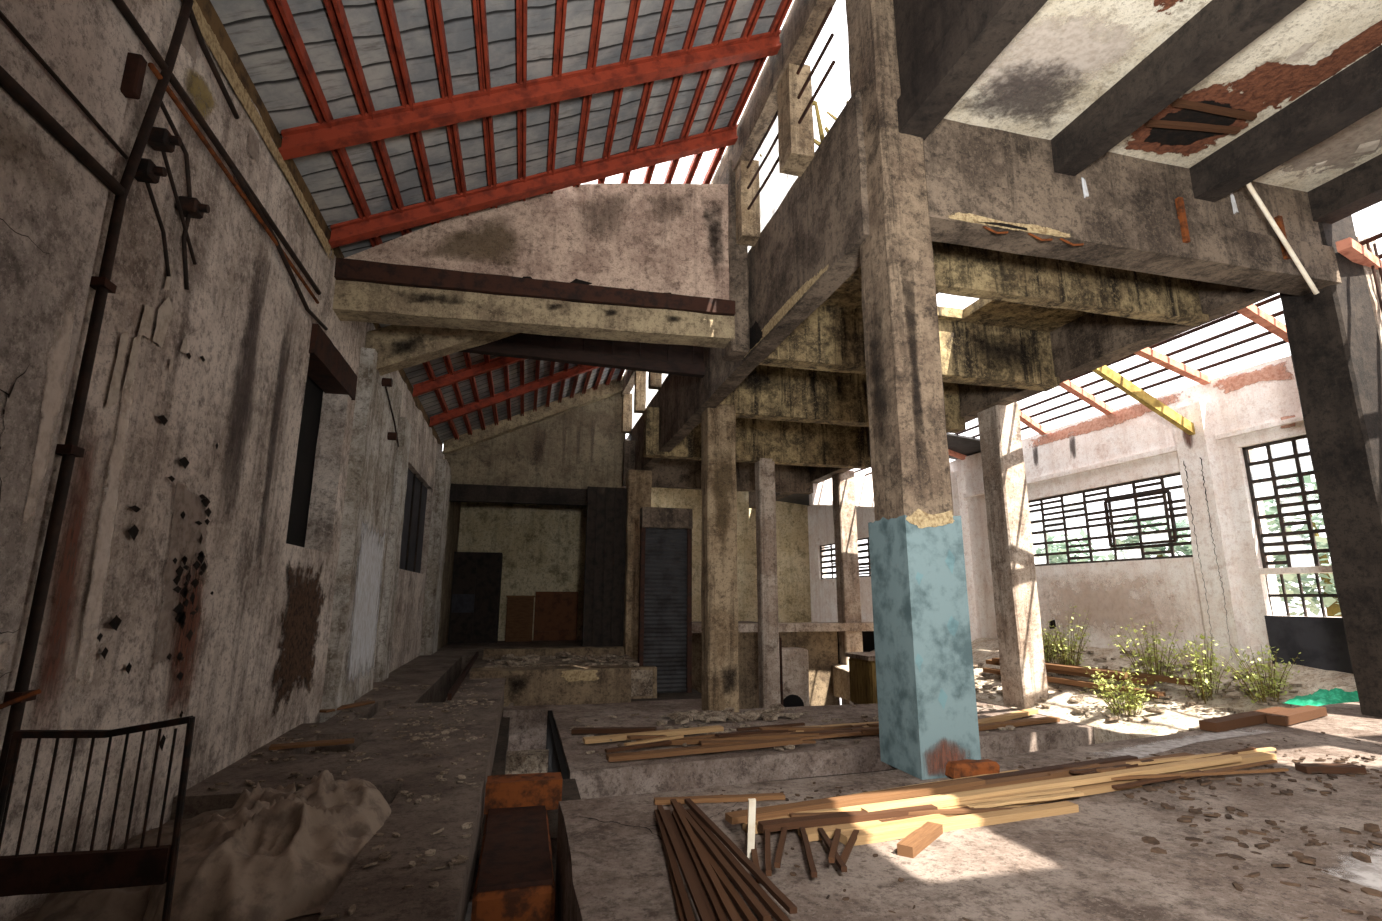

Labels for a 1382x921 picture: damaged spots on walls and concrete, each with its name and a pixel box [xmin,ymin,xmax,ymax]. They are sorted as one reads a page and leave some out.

damp [965,17,1136,126]
flaking render [1232,41,1339,109]
peeling [1280,107,1382,178]
rust [168,567,204,711]
spalling [272,560,327,716]